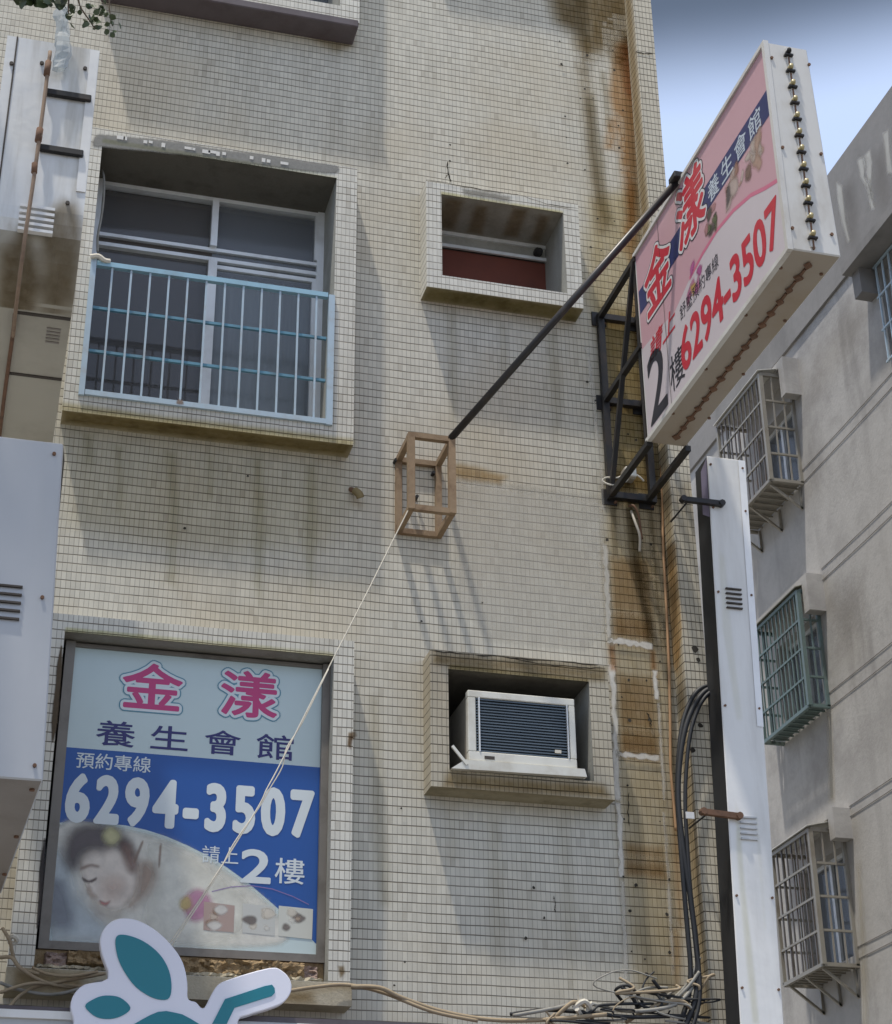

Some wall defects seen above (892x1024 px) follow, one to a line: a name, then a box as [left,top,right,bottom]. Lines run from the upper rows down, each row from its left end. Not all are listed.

spalling [34,949,76,967]
spalling [304,963,324,979]